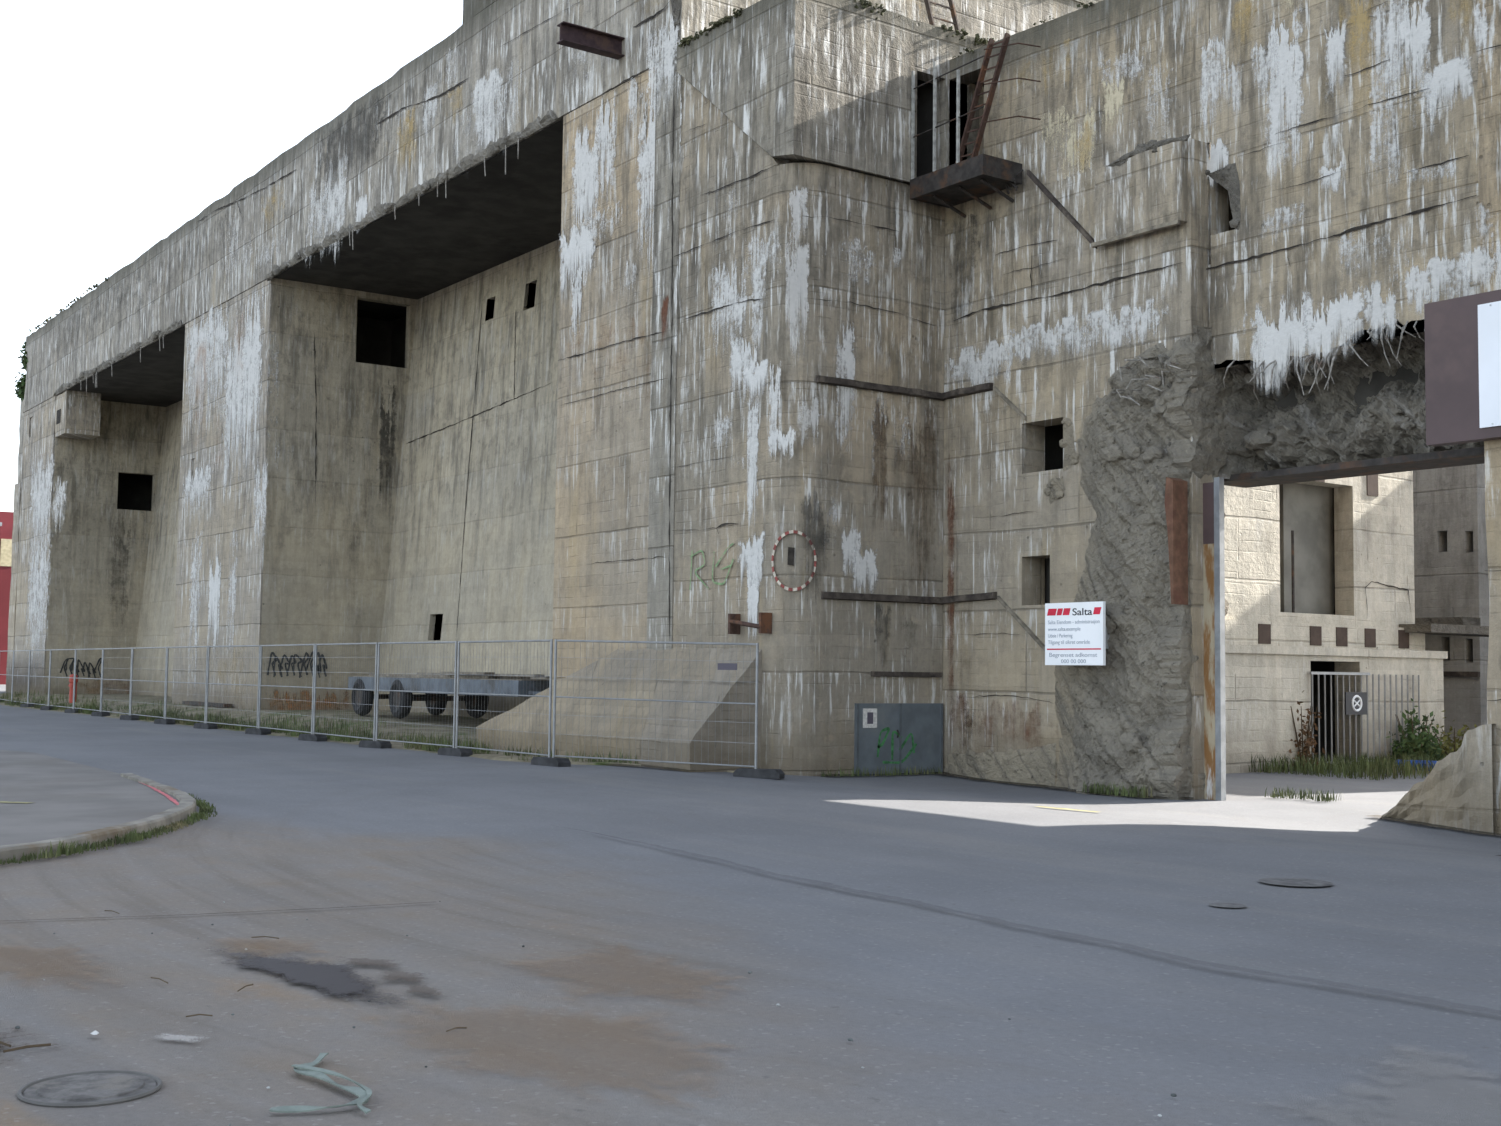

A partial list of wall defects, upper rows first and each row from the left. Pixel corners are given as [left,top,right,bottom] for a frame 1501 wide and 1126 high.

water stain [306,91,386,255]
water stain [1243,204,1501,390]
water stain [188,532,238,682]
water stain [183,288,279,536]
water stain [714,186,855,637]
water stain [803,494,878,589]
water stain [872,401,938,569]
spalling [943,319,1484,800]